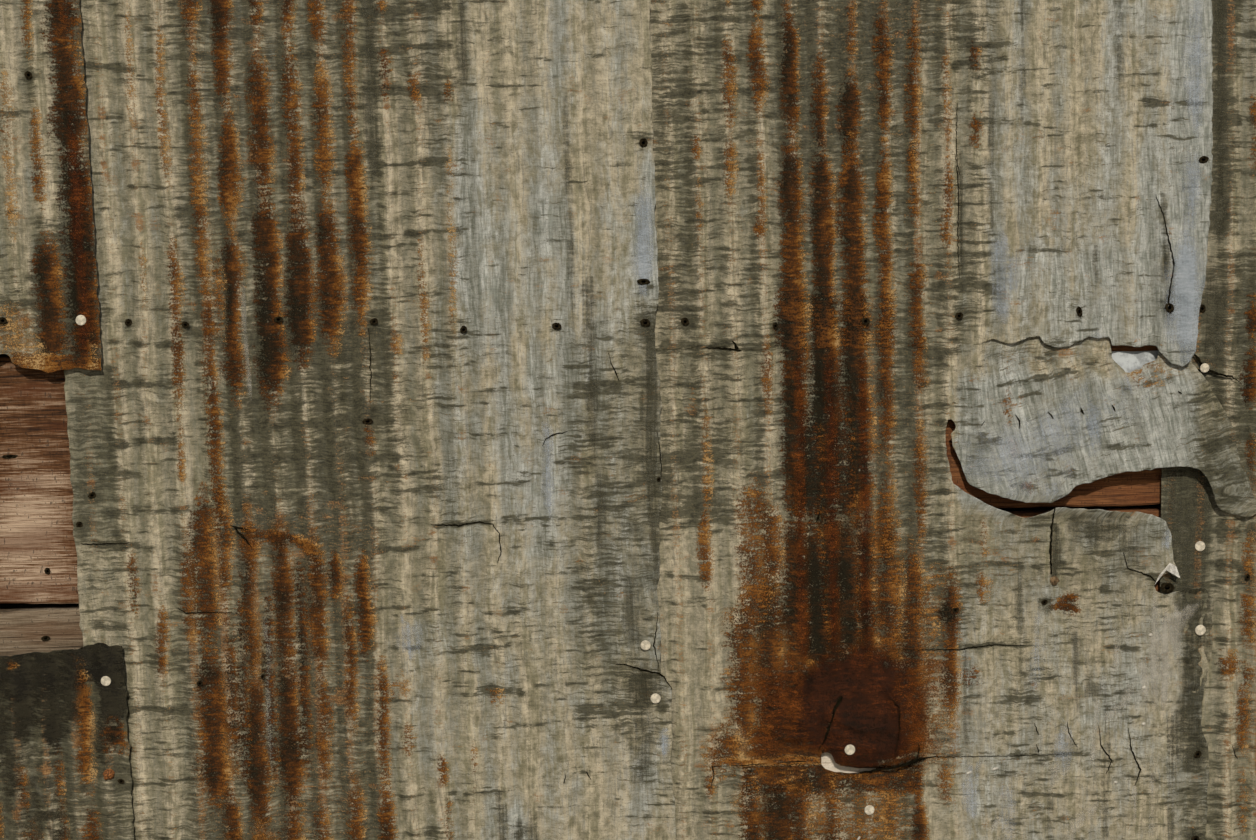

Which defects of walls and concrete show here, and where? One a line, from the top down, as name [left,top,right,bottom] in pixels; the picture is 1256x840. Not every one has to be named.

rust [0,0,102,373]
rust [127,553,141,617]
rust [155,0,417,840]
rust [417,237,431,363]
rust [696,405,714,591]
rust [700,0,993,840]
rust [1215,533,1256,755]
rust [1239,293,1256,410]
rust [16,660,129,840]
rust [437,756,454,840]